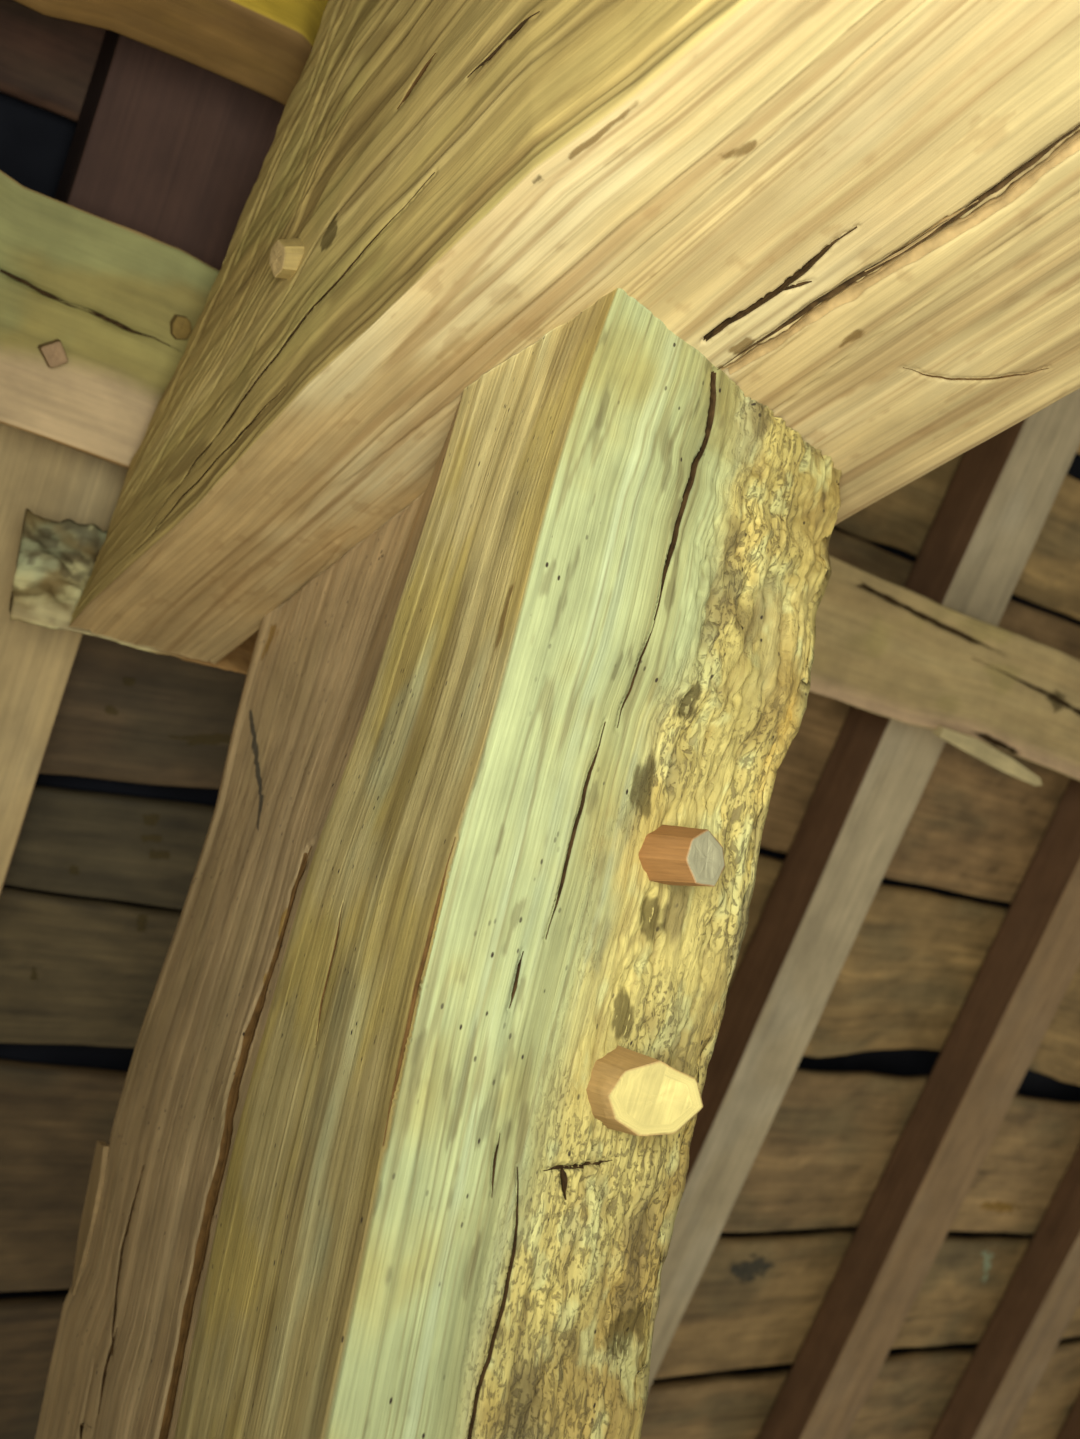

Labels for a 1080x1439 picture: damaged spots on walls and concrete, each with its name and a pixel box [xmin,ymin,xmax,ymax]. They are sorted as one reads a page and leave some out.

crack [397,53,436,109]
crack [468,11,540,77]
crack [0,269,172,347]
crack [509,125,1080,1008]
crack [159,846,312,1439]
crack [80,1165,144,1439]
crack [468,1133,612,1439]